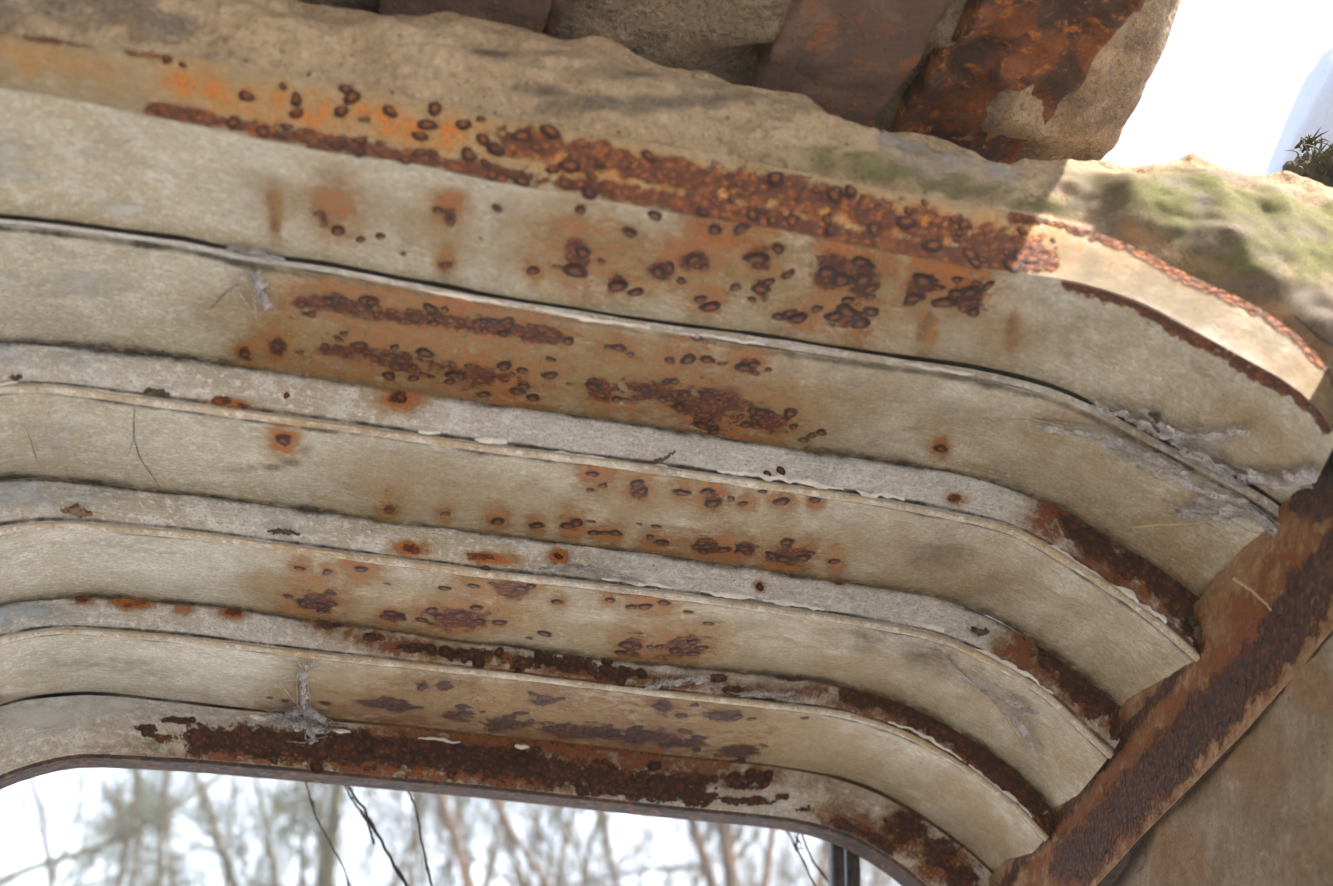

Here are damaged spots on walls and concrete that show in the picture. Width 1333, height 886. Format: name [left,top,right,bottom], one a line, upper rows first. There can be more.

rust [0,32,102,68]
rust [122,49,1333,447]
rust [268,423,301,456]
rust [930,437,951,459]
rust [75,596,94,605]
rust [110,598,155,610]
rust [128,460,1333,886]